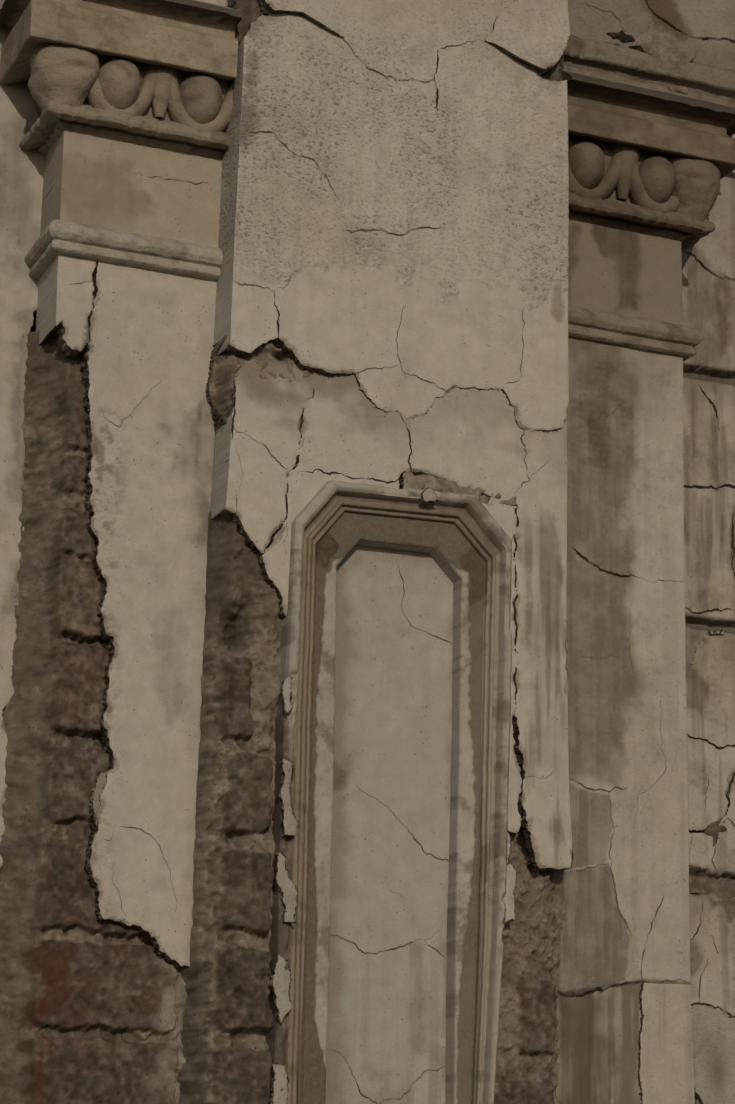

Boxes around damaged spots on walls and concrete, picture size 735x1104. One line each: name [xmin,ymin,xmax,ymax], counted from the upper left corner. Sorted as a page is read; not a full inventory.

flaking render [399,471,516,506]
flaking render [0,331,488,1104]
flaking render [494,790,622,1104]